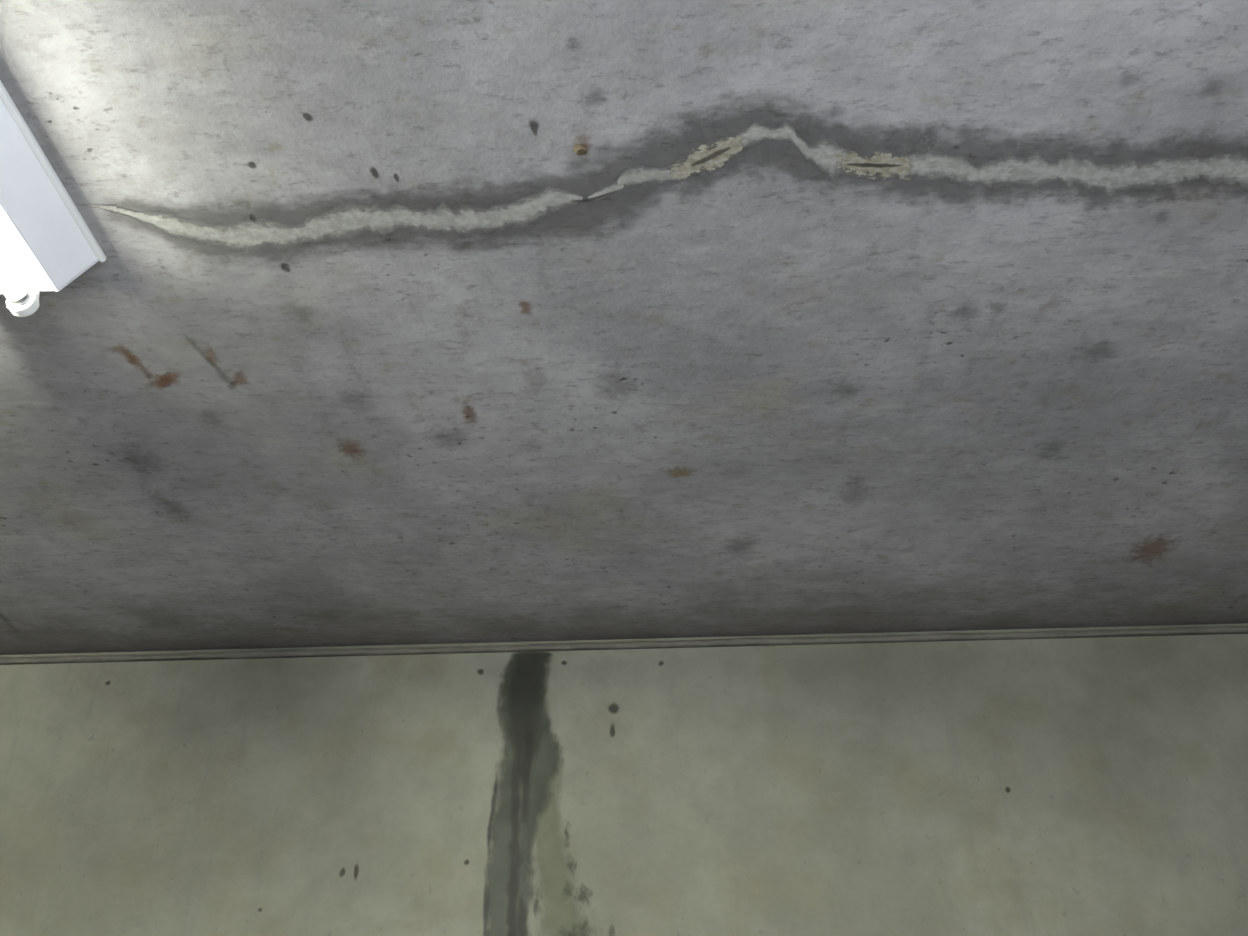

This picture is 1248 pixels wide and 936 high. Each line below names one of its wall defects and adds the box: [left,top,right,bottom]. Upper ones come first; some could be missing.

crack [82,125,1248,247]
water stain [484,651,584,936]